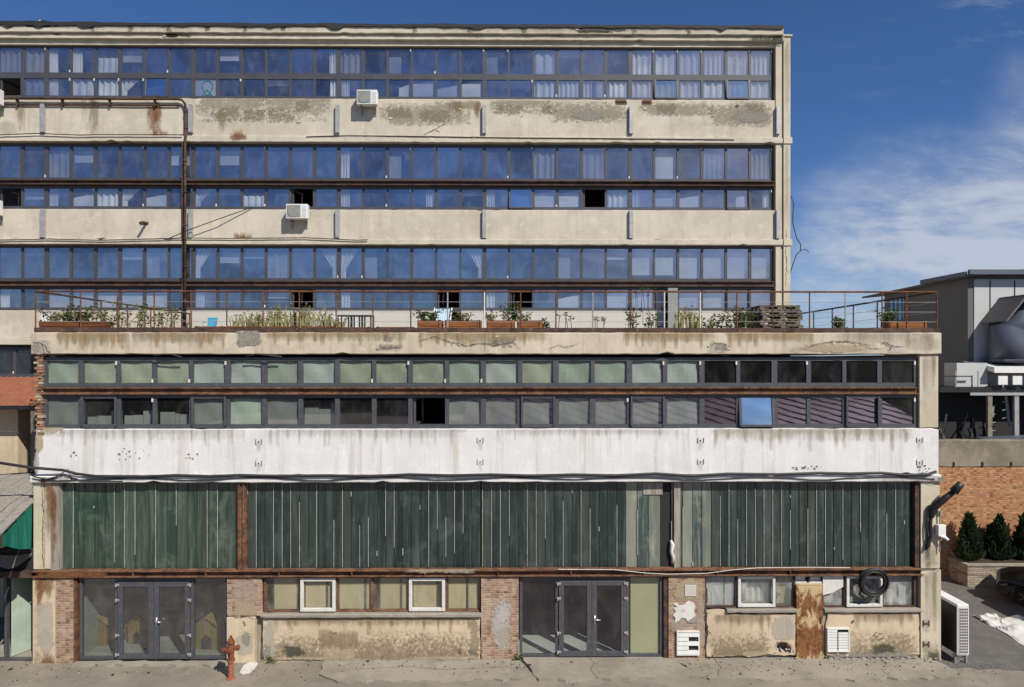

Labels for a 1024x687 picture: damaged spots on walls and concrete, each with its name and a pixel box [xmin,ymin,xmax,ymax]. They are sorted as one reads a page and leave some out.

corrosion [148,102,163,136]
leakage [58,333,225,346]
leakage [269,332,401,342]
crack [376,336,520,349]
crack [809,341,905,349]
corrosion [46,484,56,549]
peeling [673,601,698,623]